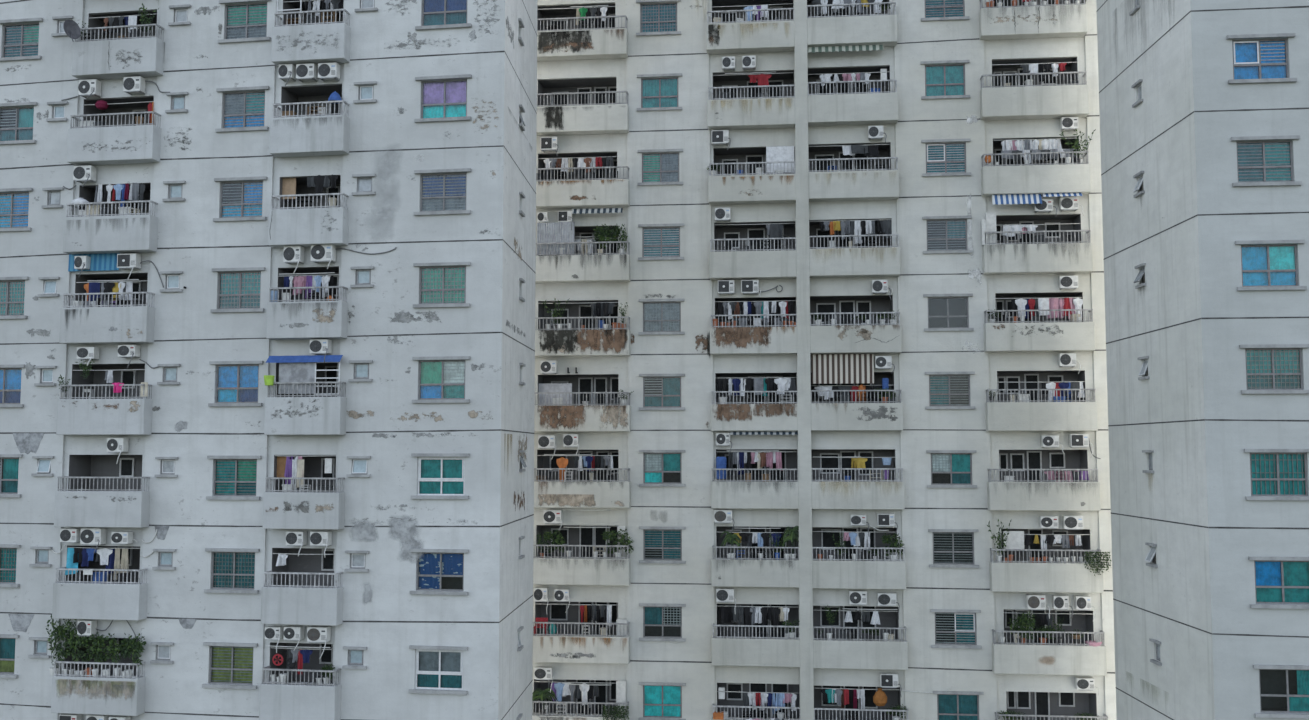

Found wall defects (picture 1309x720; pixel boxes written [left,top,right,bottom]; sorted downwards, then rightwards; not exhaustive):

leakage [538,30,591,53]
mould [540,330,578,353]